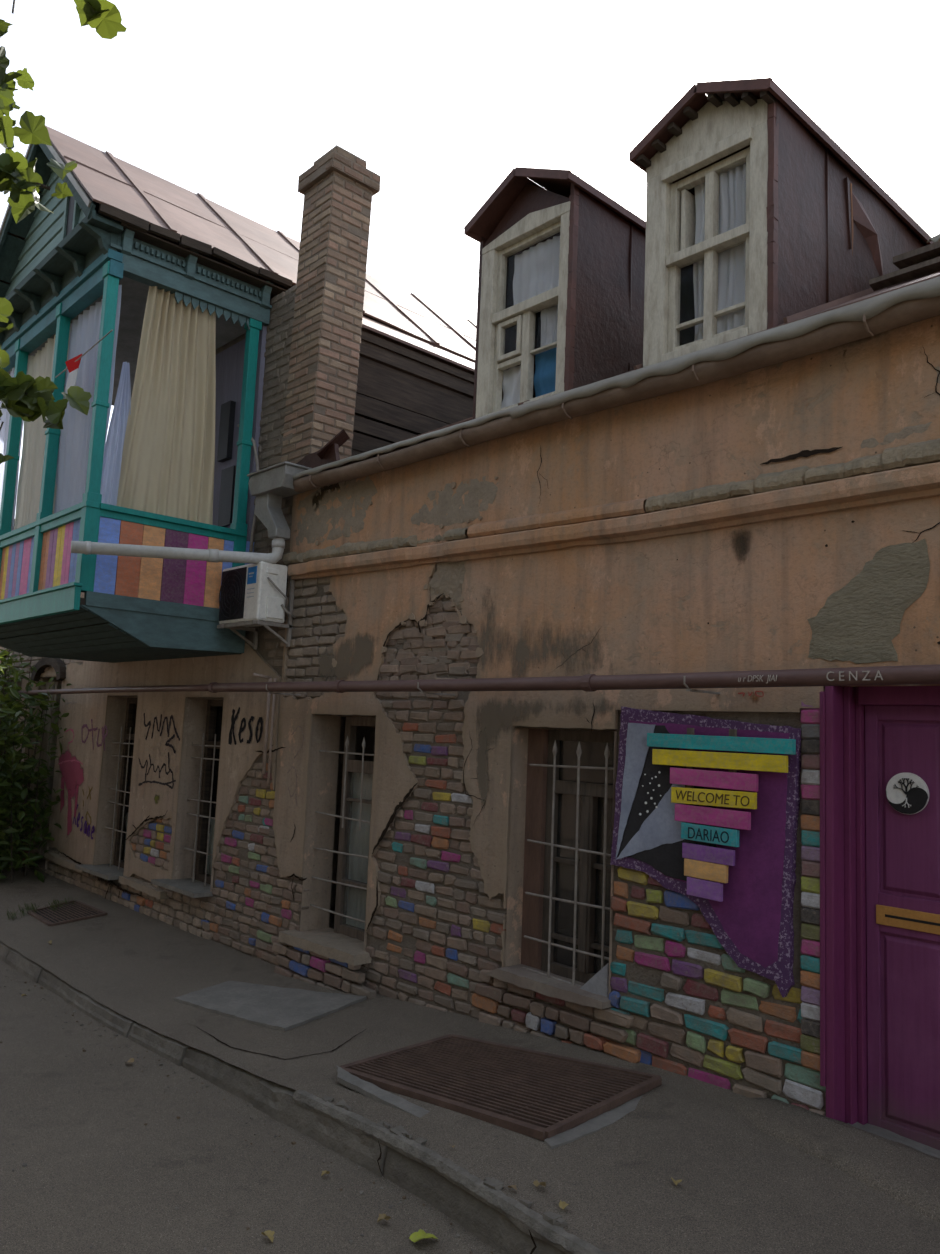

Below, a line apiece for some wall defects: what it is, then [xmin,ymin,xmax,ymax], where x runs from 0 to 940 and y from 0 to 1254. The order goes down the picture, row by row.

crack [923,347,940,398]
spalling [278,576,347,700]
spalling [376,561,484,697]